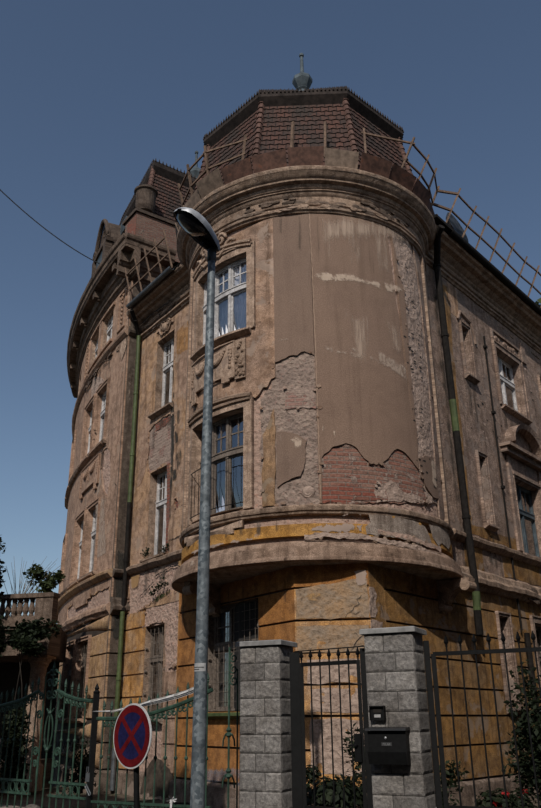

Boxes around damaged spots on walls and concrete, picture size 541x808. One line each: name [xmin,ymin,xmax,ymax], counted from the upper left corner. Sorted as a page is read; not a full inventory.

peeling [244,198,339,214]
spalling [259,201,442,508]
spalling [146,412,176,473]
peeling [419,523,451,549]